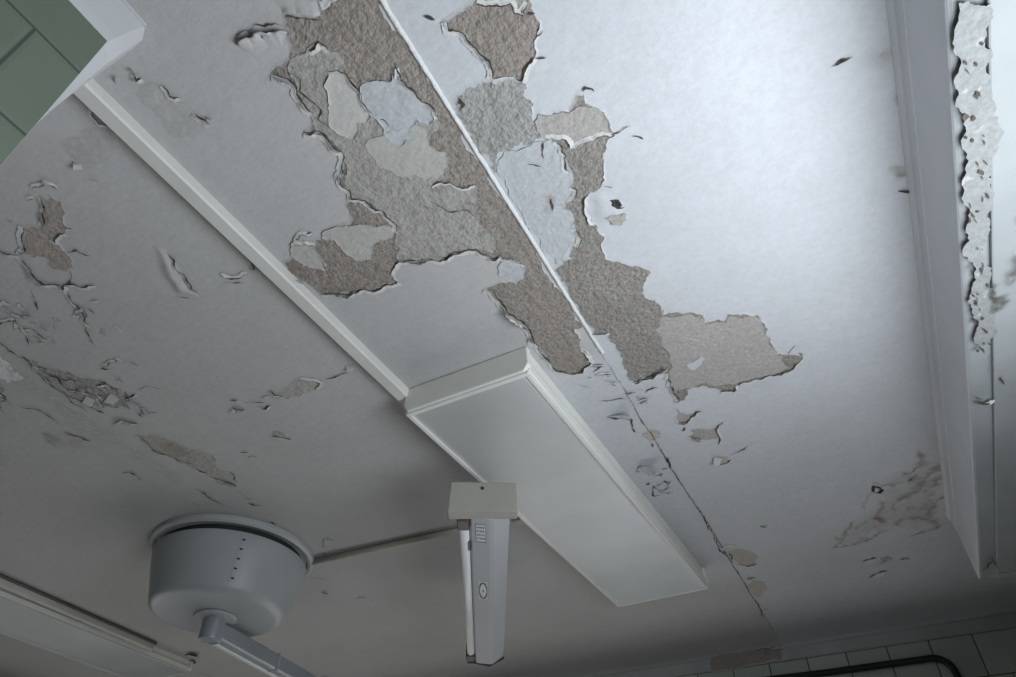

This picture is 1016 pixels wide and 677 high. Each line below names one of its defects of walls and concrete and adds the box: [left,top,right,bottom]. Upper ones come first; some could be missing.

flaking render [0,358,58,424]
peeling [10,180,88,273]
crack [0,251,159,417]
peeling [114,420,239,488]
peeling [220,261,255,284]
peeling [231,0,805,465]
crack [577,356,772,629]
peeling [952,1,1004,353]